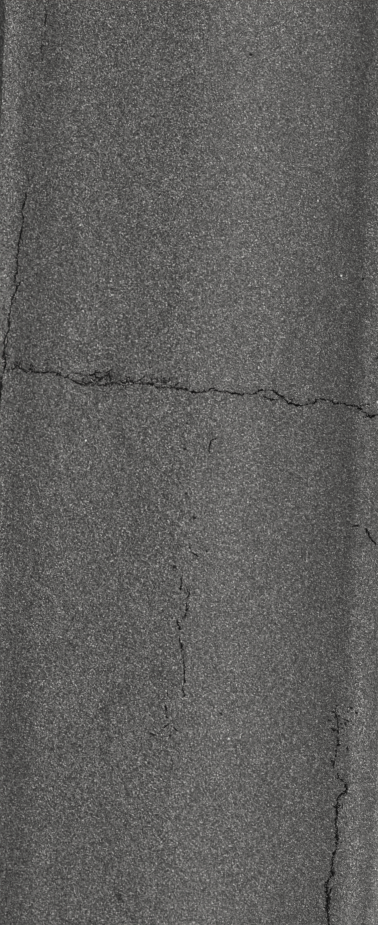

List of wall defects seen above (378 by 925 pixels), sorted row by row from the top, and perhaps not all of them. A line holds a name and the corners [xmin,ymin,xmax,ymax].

crack [0,2,378,433]
crack [150,543,208,736]
crack [317,708,350,925]